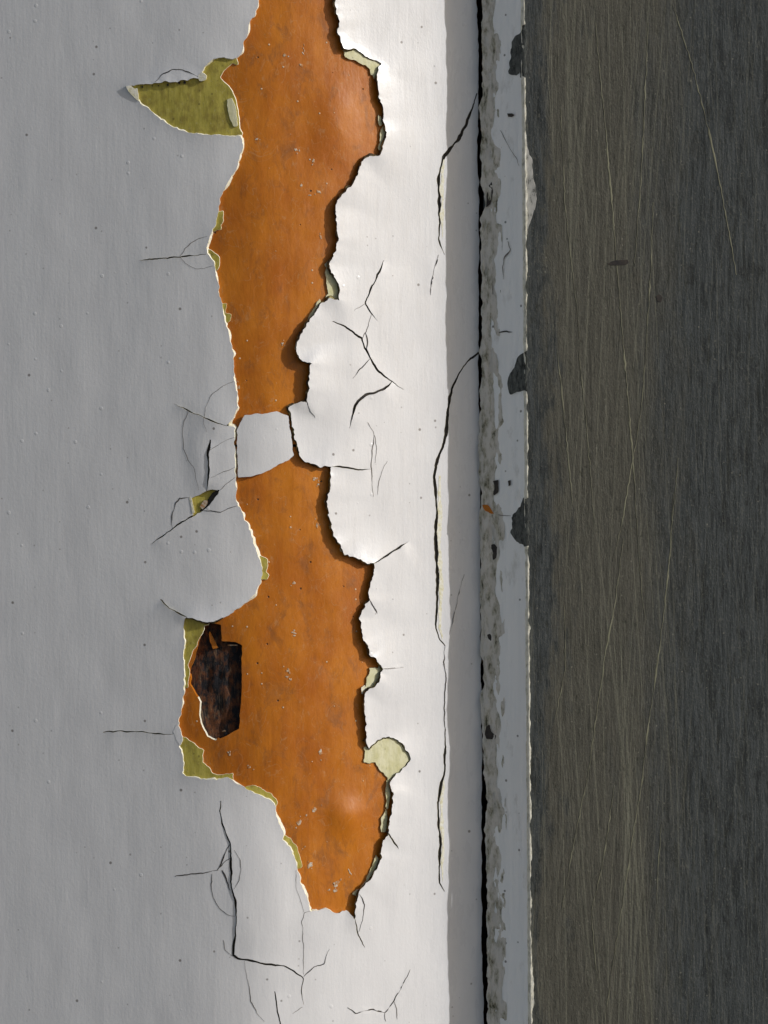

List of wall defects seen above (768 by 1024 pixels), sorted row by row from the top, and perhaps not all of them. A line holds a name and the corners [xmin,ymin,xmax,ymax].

peeling [508,28,528,77]
crack [140,236,211,269]
crack [430,93,478,295]
crack [154,381,235,542]
peeling [126,0,410,916]
crack [333,263,401,496]
crack [375,543,406,563]
crack [433,352,479,890]
peeling [507,353,529,394]
peeling [510,497,530,547]
crack [176,801,330,1024]
crack [348,971,410,1021]